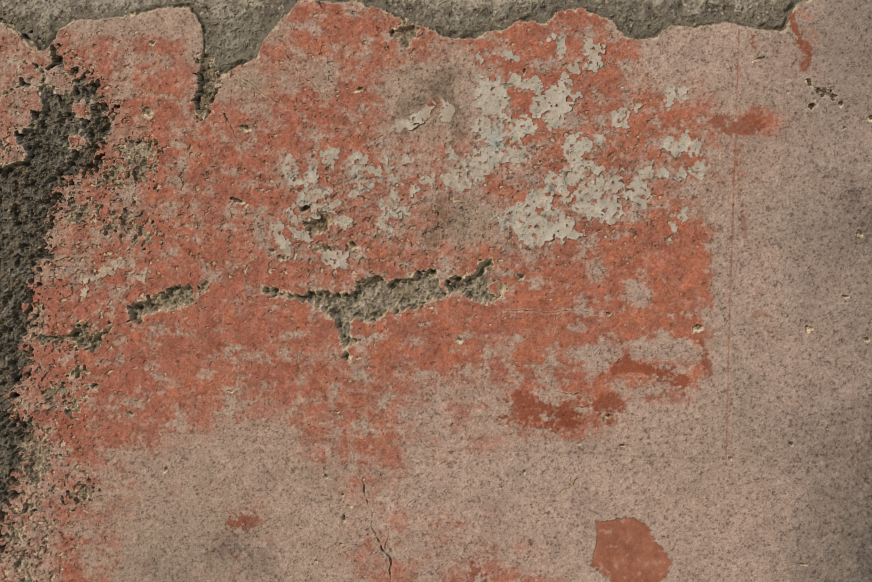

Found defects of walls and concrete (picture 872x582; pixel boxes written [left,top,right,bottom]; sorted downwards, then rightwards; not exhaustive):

spalling [389,18,420,49]
spalling [191,50,221,123]
peeling [268,33,711,269]
spalling [0,17,165,582]
spalling [126,280,210,323]
spalling [261,257,509,361]
spalling [691,323,705,334]
crack [348,434,393,582]